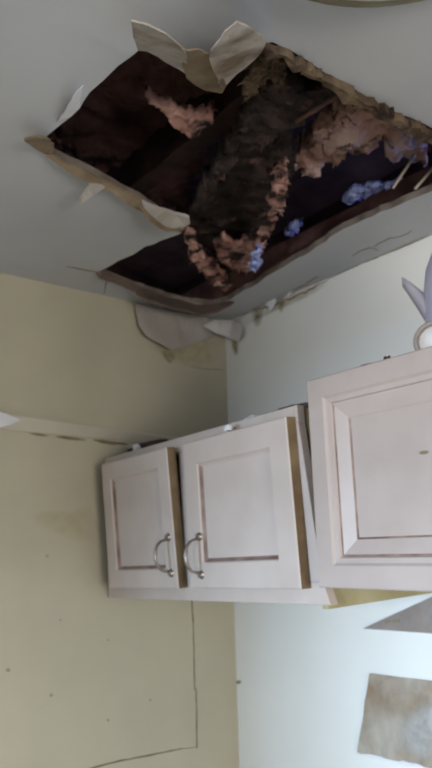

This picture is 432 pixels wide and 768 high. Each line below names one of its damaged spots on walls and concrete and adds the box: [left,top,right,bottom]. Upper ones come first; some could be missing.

crack [91,601,198,768]